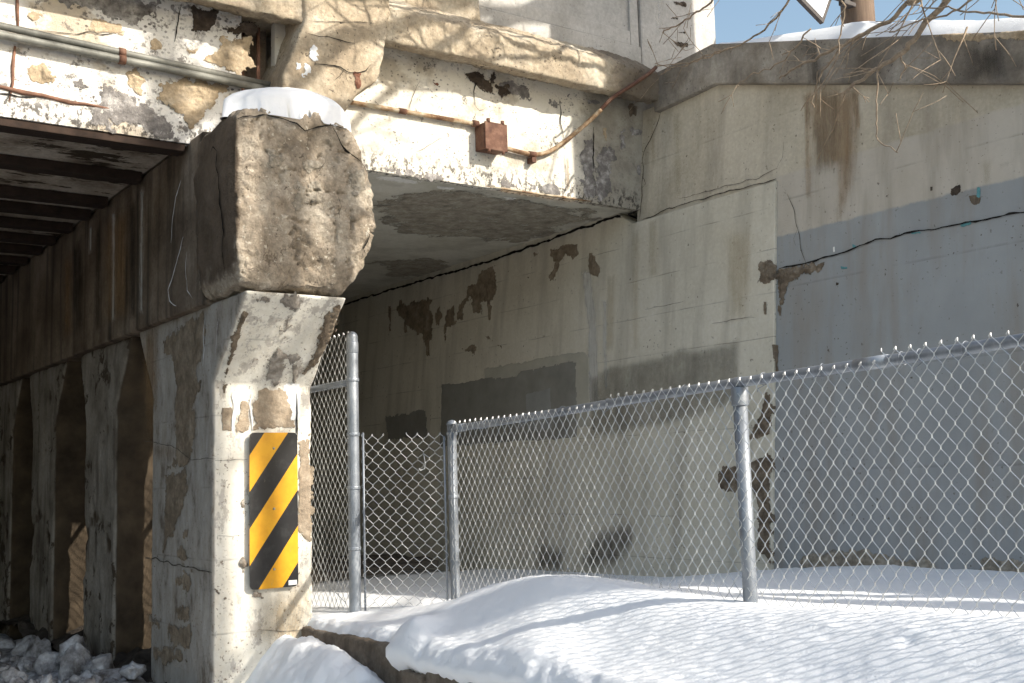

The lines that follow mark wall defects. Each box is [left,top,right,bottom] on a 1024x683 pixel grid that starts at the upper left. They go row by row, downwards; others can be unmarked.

peeling [0,46,229,140]
spalling [187,5,258,75]
spalling [465,71,531,101]
crack [211,147,224,265]
crack [344,112,1024,305]
peeling [388,266,497,356]
spalling [758,260,825,315]
peeling [221,291,341,433]
peeling [162,311,206,592]
spalling [718,466,737,493]
spalling [749,392,776,440]
spalling [751,453,776,564]